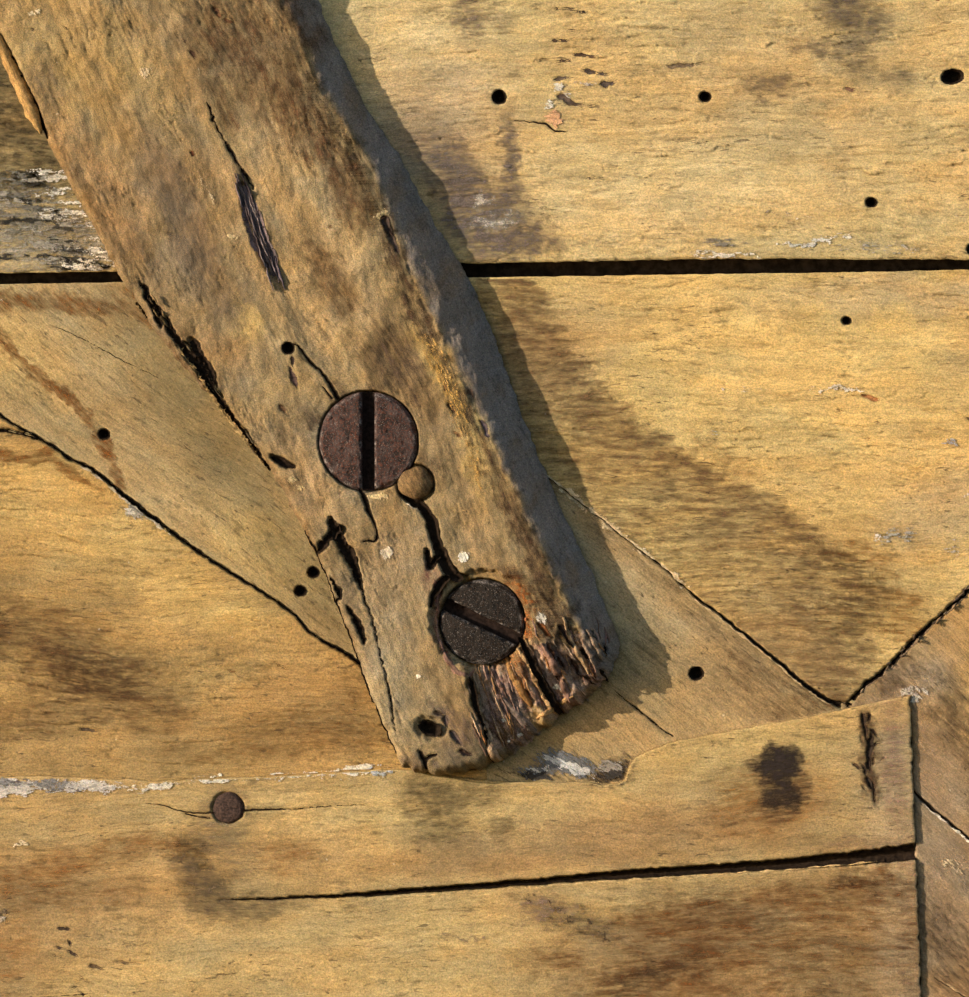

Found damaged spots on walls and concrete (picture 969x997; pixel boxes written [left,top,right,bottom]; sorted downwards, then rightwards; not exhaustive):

crack [206,102,254,190]
crack [135,276,295,471]
damp [476,279,922,722]
crack [0,414,437,770]
spalling [434,592,610,763]
corrosion [512,575,551,637]
peeling [512,747,626,781]
crack [219,844,915,900]